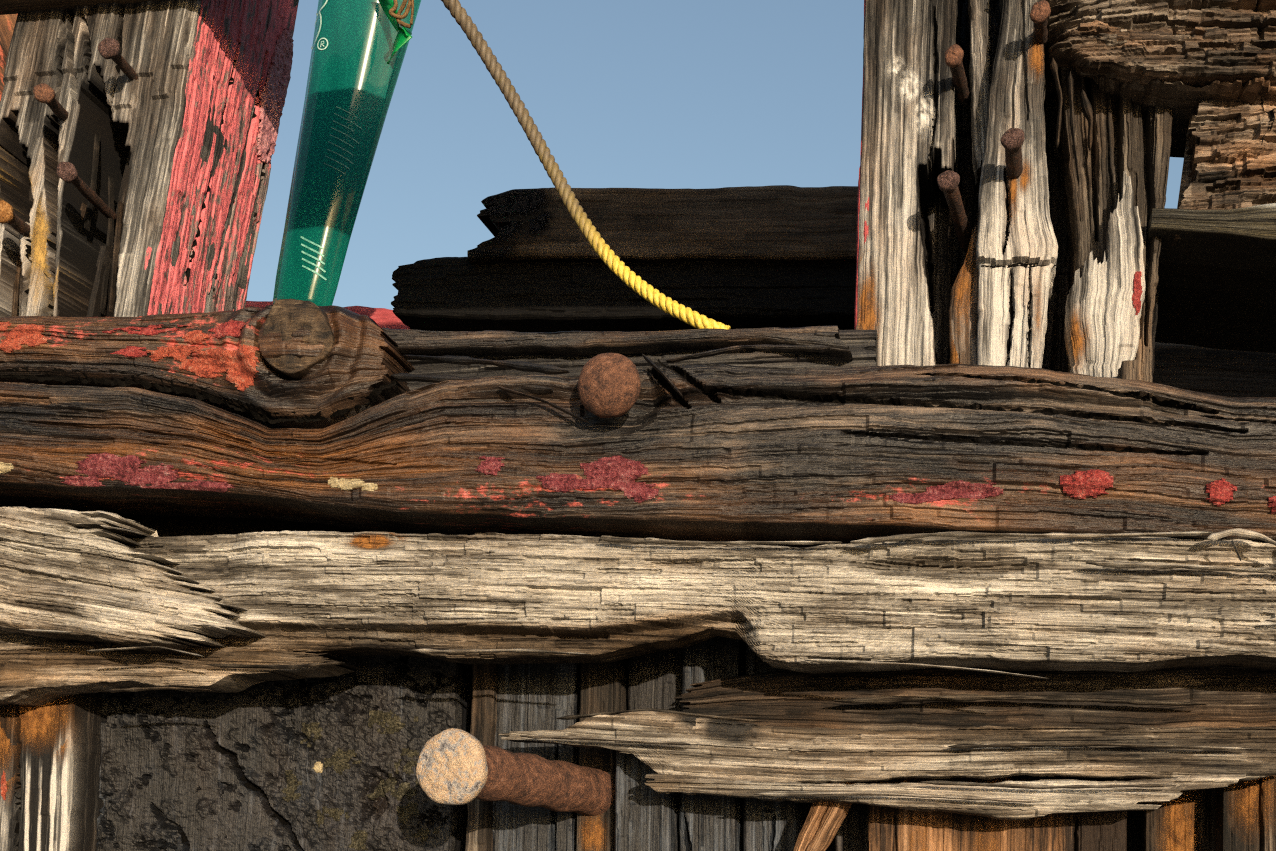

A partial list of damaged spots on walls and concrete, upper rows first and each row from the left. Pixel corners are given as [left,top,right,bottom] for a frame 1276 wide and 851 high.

rust [1031,41,1043,72]
peeling [256,28,294,163]
rust [1008,166,1028,215]
peeling [0,322,48,353]
peeling [102,320,260,391]
peeling [475,456,505,476]
peeling [536,456,659,503]
peeling [890,480,1003,504]
peeling [1059,469,1113,499]
crack [203,723,303,849]
crack [178,828,190,848]